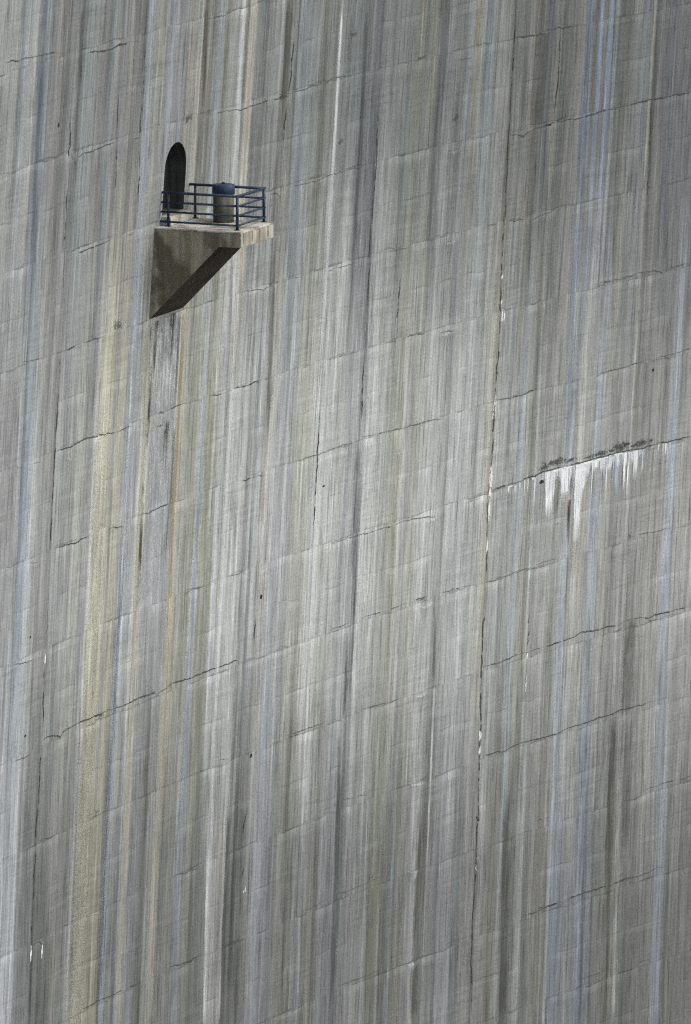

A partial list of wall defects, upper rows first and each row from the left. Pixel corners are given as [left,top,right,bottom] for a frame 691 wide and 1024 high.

crack [496,436,690,489]
crack [338,516,430,542]
leakage [508,438,671,570]